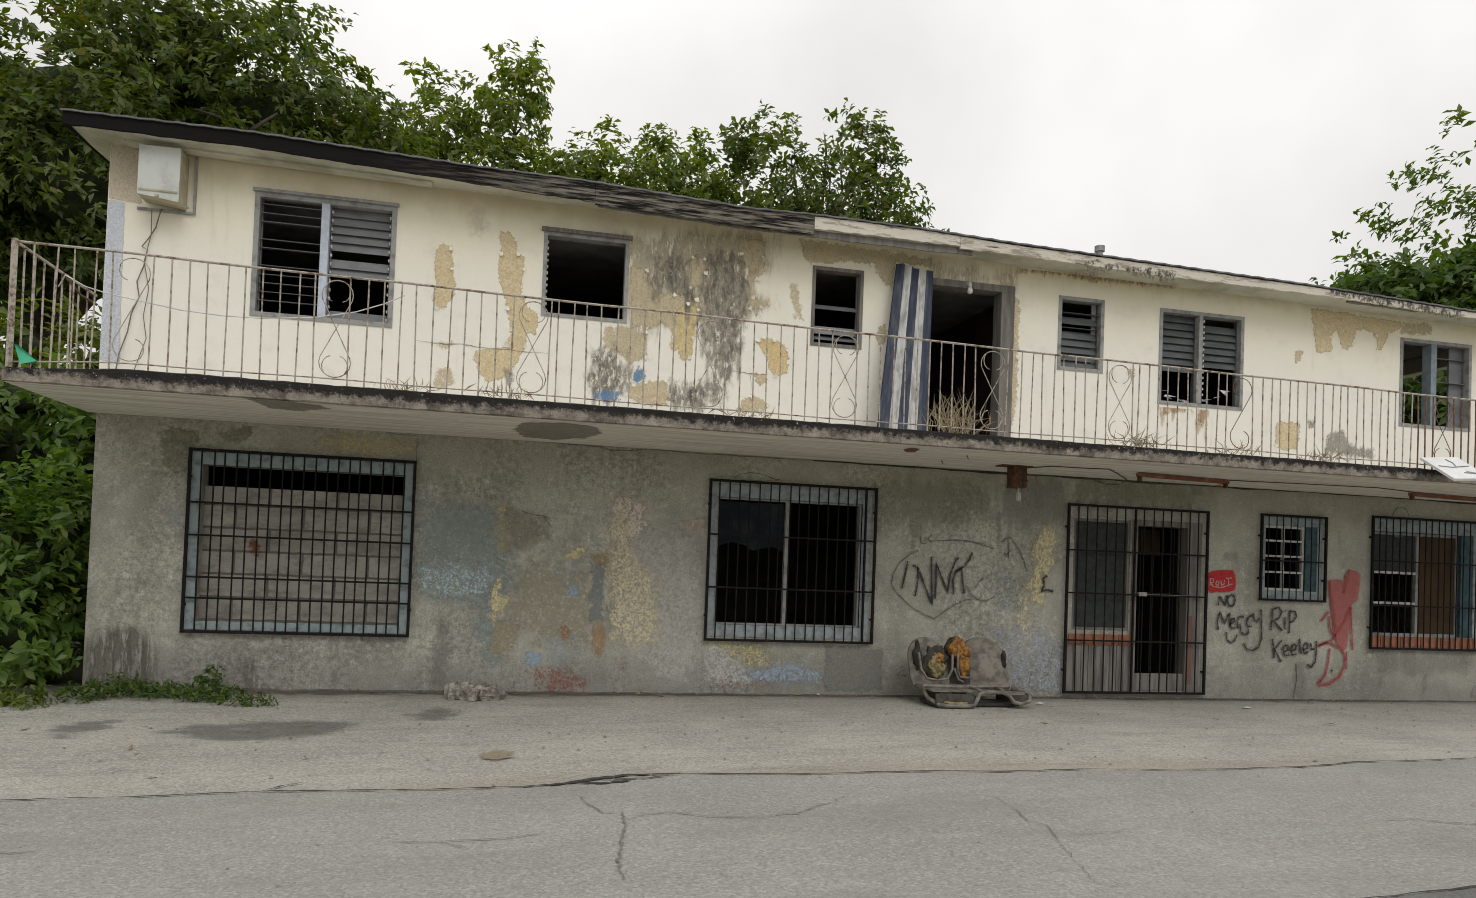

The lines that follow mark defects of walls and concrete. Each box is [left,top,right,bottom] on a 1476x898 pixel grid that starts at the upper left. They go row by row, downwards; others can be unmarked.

peeling [432,242,456,310]
peeling [473,231,538,383]
water stain [628,233,768,411]
peeling [1295,308,1432,363]
peeling [741,336,789,414]
peeling [1274,421,1301,451]
crack [1225,757,1476,769]
crack [2,768,1139,885]
crack [1364,885,1476,898]